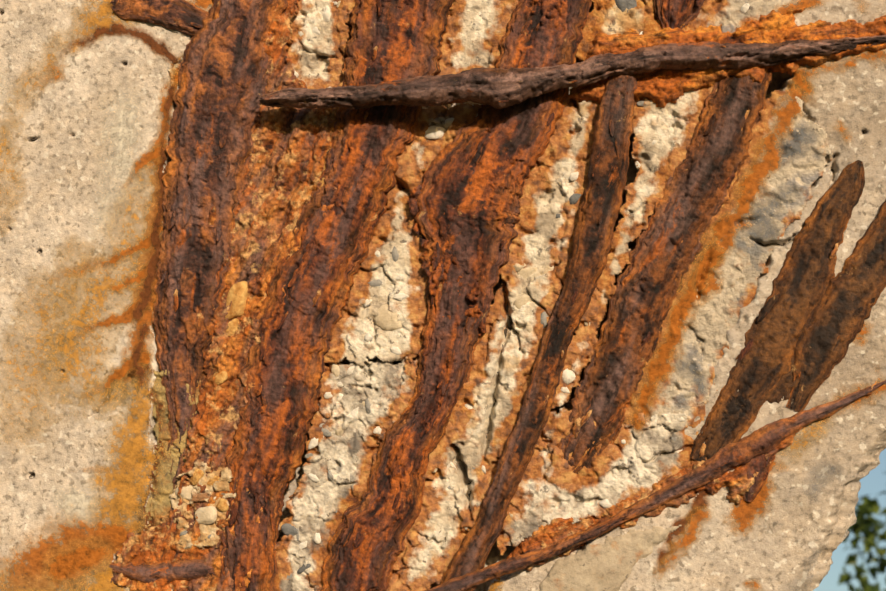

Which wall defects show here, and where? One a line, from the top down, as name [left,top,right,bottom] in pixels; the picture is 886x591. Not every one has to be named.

spalling [288,0,355,89]
spalling [437,0,520,75]
rust [777,0,822,15]
rust [0,0,182,591]
spalling [273,103,481,591]
spalling [385,94,600,591]
spalling [497,84,832,556]
rust [630,50,886,430]
spalling [139,370,237,550]
rust [225,498,238,528]
rust [658,490,709,572]
rust [731,461,776,532]